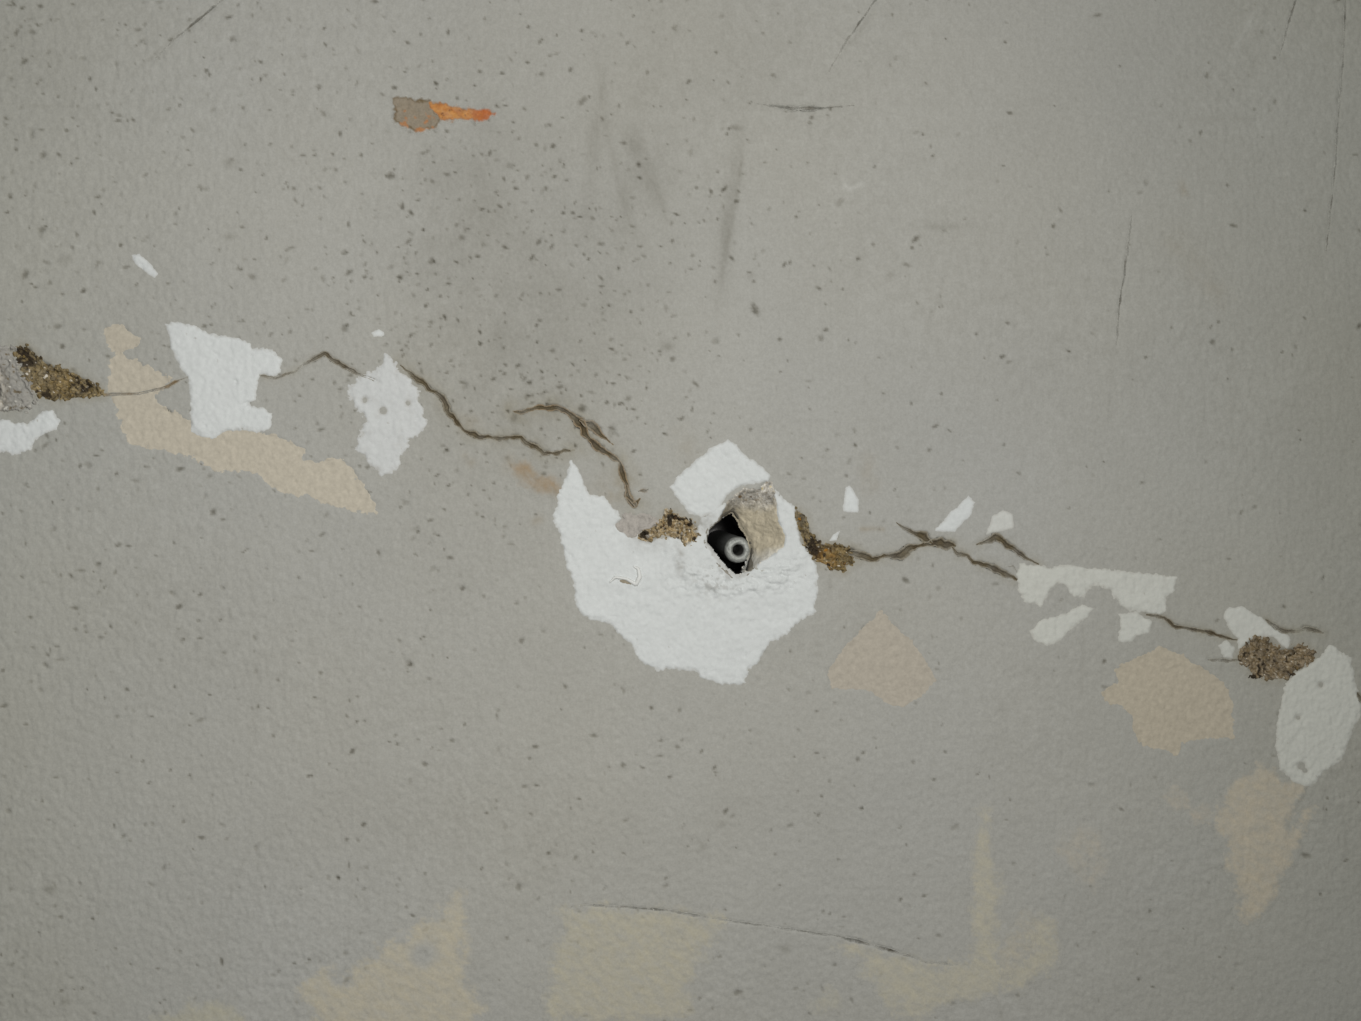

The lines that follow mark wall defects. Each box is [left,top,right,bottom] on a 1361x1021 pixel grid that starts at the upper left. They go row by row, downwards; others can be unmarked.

corrosion [391,95,498,134]
peeling [132,254,158,278]
crack [101,376,188,397]
flaking render [0,322,428,515]
crack [259,351,649,508]
peeling [843,486,859,513]
peeling [553,439,855,685]
crack [848,522,1039,581]
flaking render [1016,563,1235,756]
crack [1146,614,1238,663]
crack [1265,619,1324,634]
peeling [1218,606,1361,786]